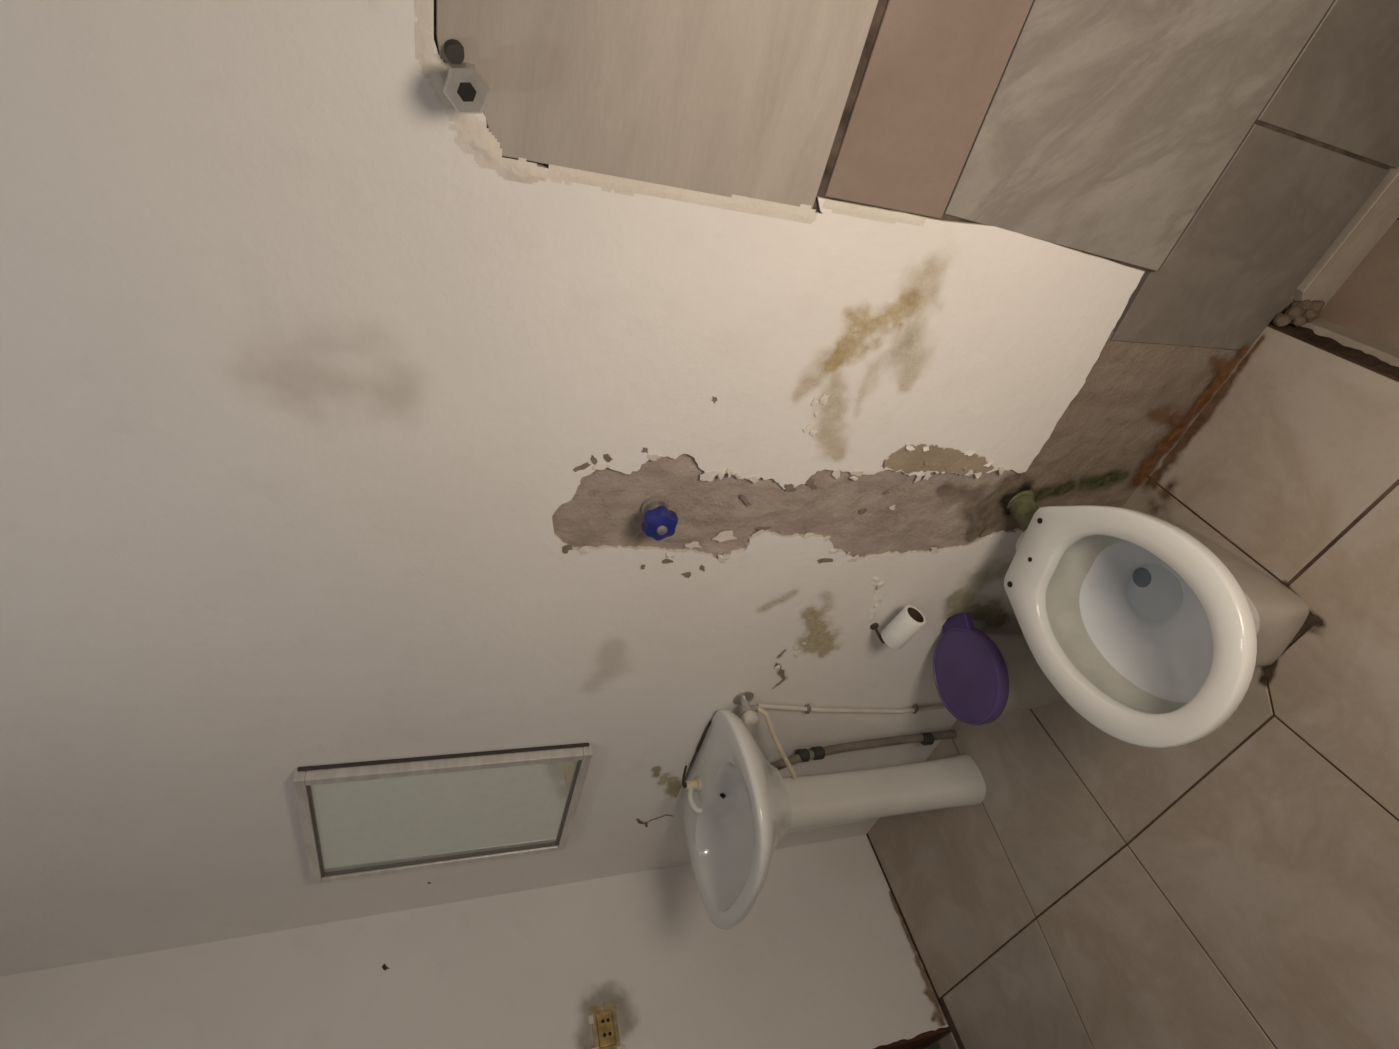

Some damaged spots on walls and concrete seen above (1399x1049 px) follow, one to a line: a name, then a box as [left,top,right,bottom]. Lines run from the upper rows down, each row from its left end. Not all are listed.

damp [826,293,916,371]
spalling [552,331,1249,578]